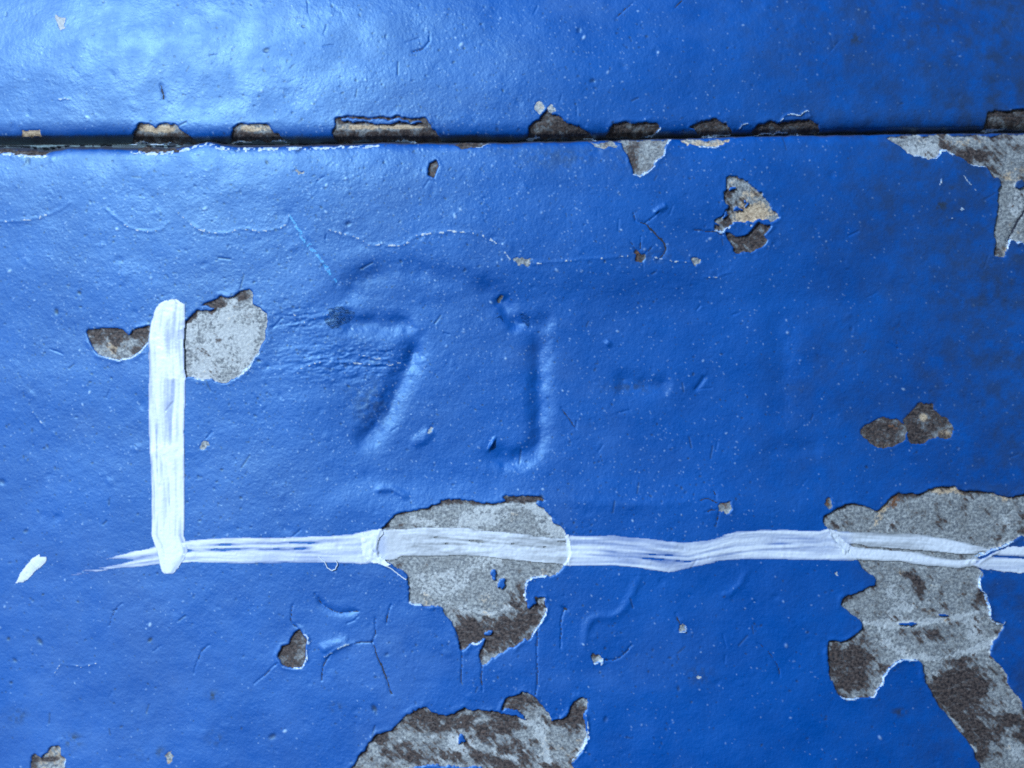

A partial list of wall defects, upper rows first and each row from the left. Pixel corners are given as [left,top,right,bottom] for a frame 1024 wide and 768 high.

peeling [131,116,442,156]
peeling [526,101,733,177]
peeling [750,119,820,136]
peeling [714,176,779,254]
peeling [887,109,1024,257]
peeling [87,326,151,362]
peeling [183,289,268,383]
peeling [383,496,566,665]
peeling [277,630,307,669]
peeling [823,486,1024,768]
peeling [31,746,66,768]
peeling [352,692,590,768]